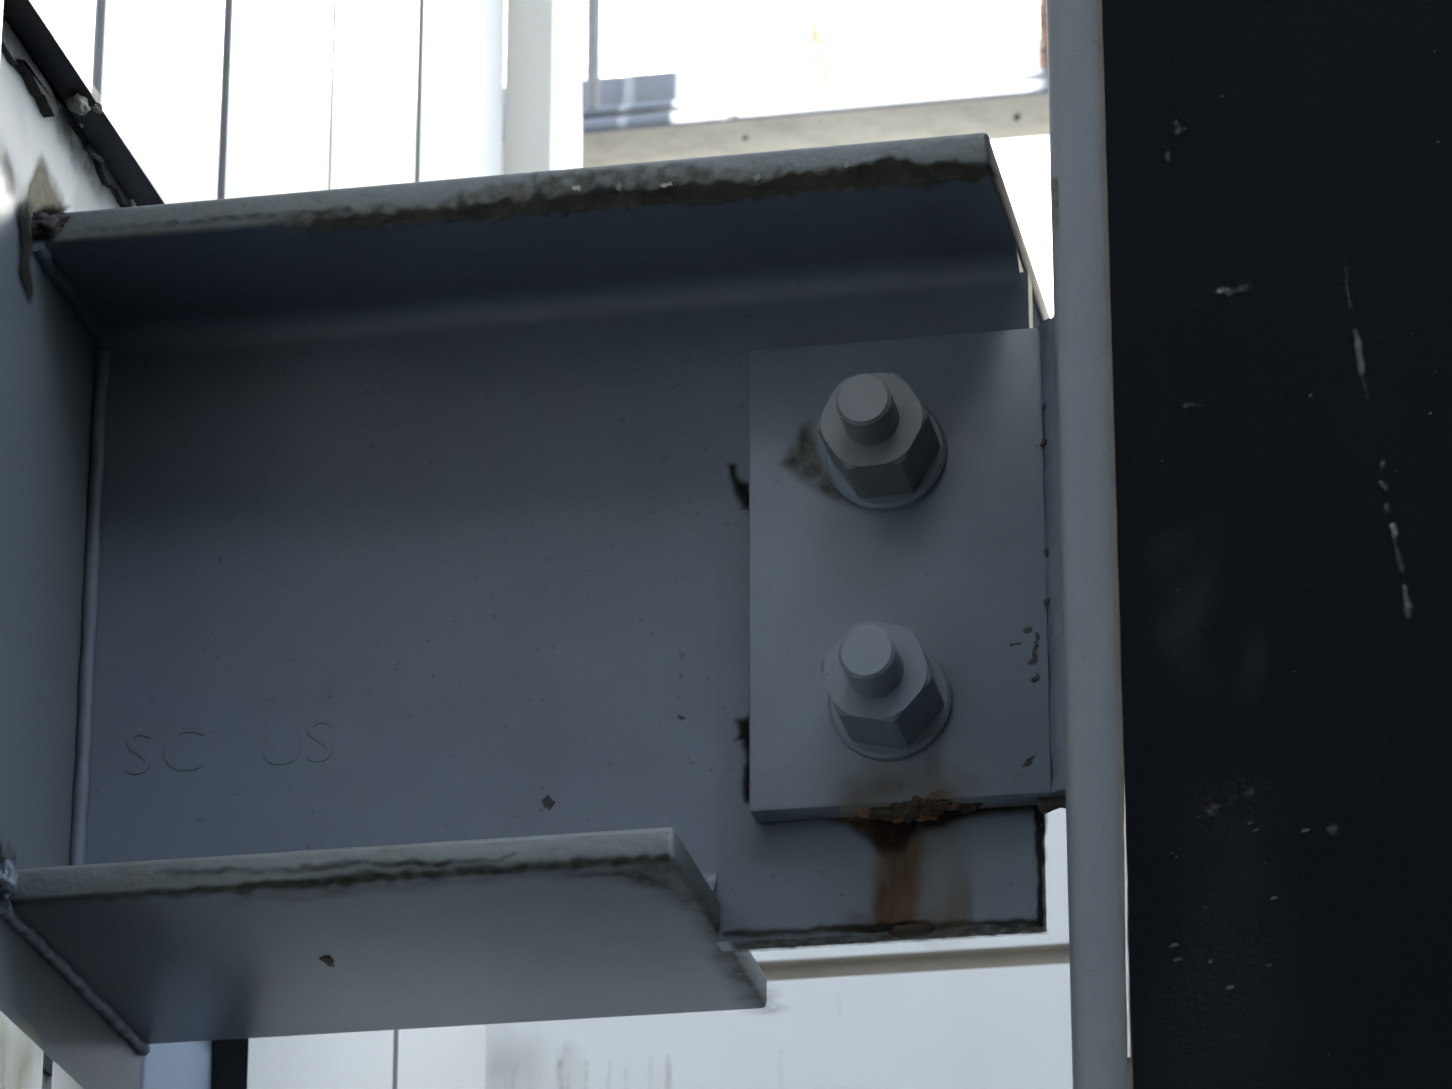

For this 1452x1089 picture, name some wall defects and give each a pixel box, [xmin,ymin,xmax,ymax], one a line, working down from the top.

corrosion [1038,0,1048,68]
corrosion [832,805,1036,924]